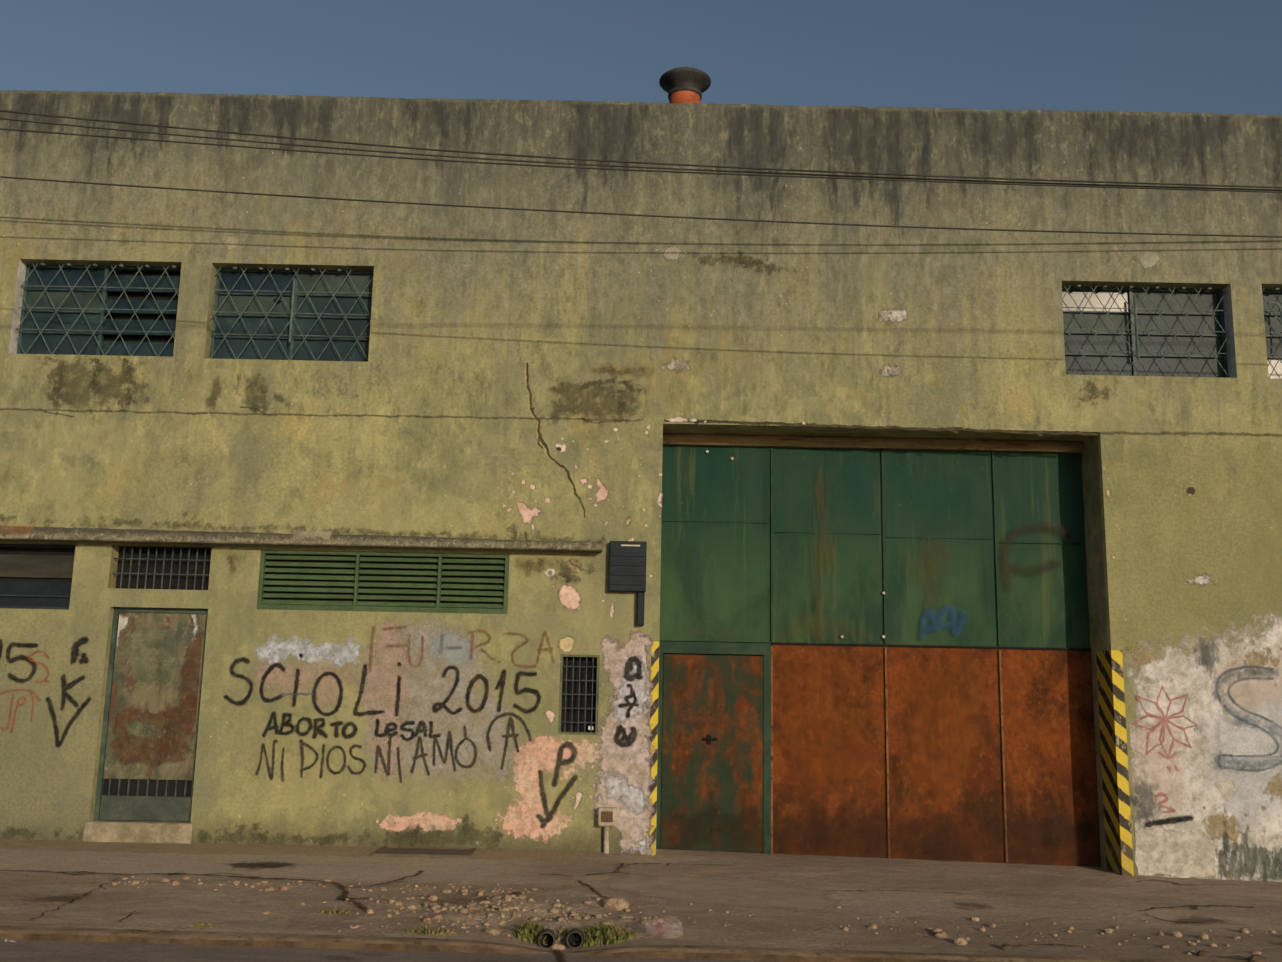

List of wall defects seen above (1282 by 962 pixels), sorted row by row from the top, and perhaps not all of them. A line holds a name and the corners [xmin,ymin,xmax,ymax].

damp [45,358,146,407]
damp [550,379,639,421]
crack [0,363,643,518]
flaking render [503,472,551,534]
flaking render [554,437,613,508]
flaking render [622,492,663,541]
peeling [645,416,1282,882]
peeling [256,623,656,855]